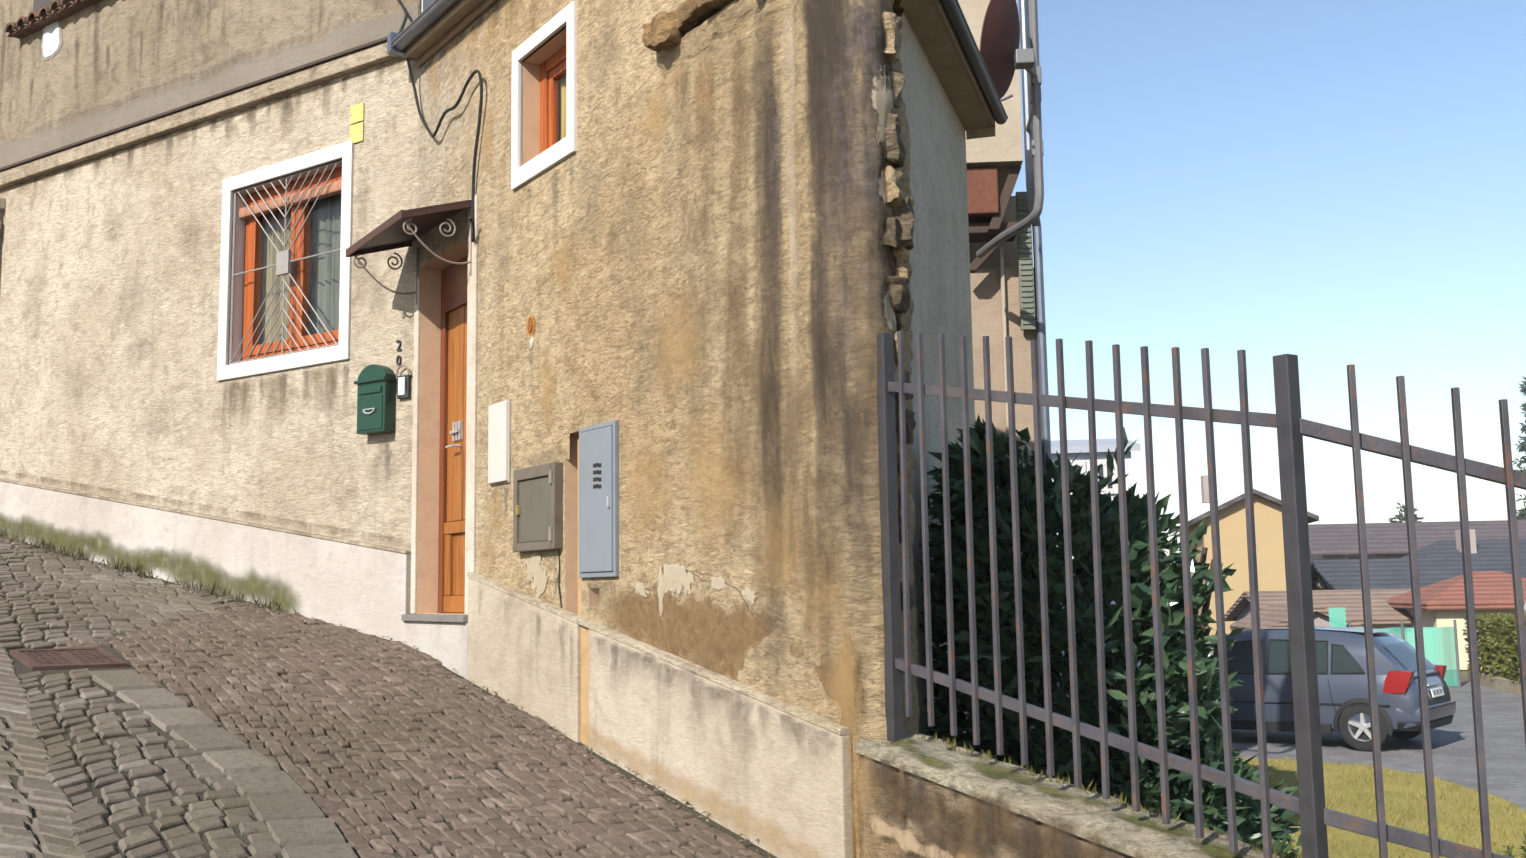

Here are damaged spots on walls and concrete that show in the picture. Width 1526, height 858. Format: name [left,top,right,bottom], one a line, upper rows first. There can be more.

leakage [758,46,780,215]
leakage [805,0,888,208]
spalling [871,12,916,543]
peeling [614,563,773,680]
peeling [790,635,861,729]
spalling [900,582,917,626]